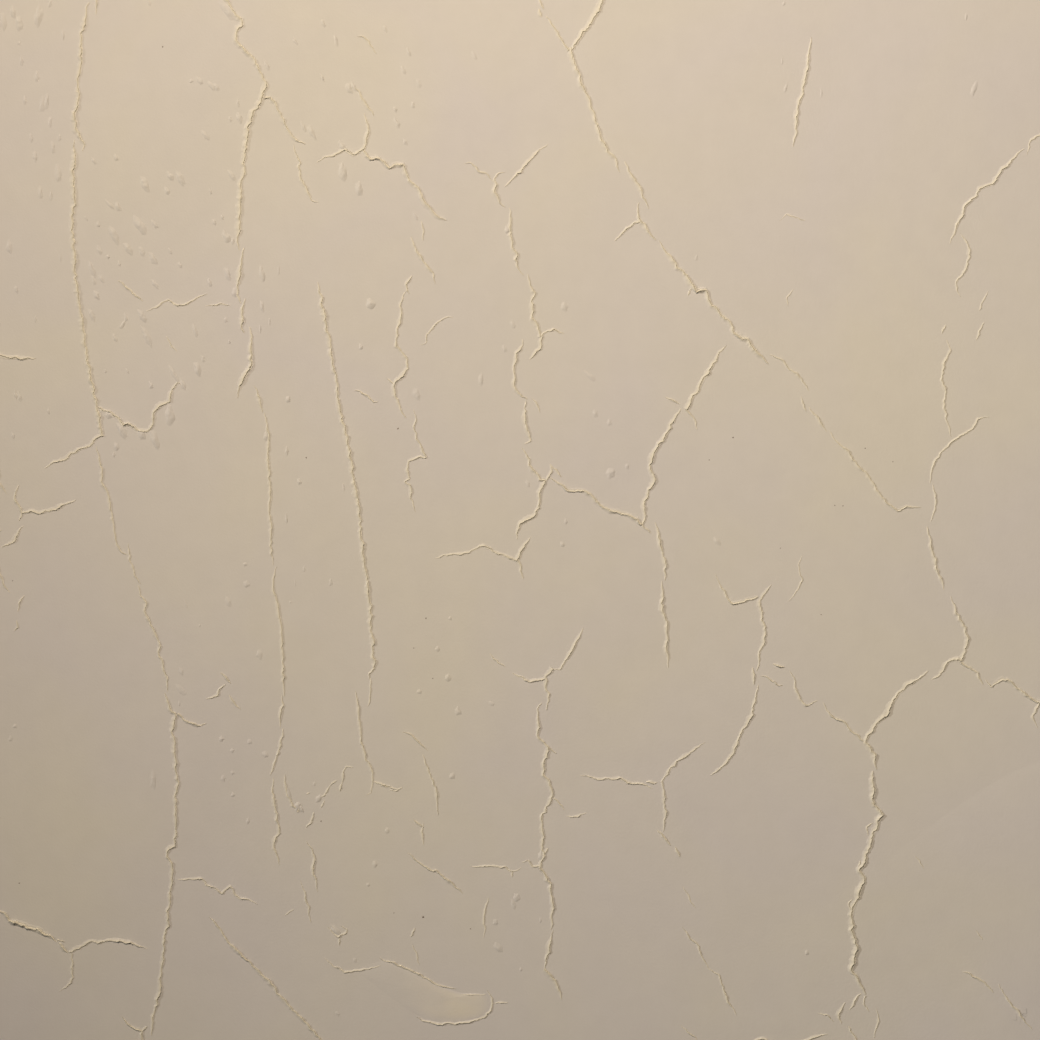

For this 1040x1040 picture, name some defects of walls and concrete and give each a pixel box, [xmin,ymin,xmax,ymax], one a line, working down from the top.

crack [0,0,257,1040]
crack [209,917,323,1040]
crack [118,0,451,865]
crack [300,841,318,923]
crack [403,629,587,1000]
crack [437,0,1040,1040]